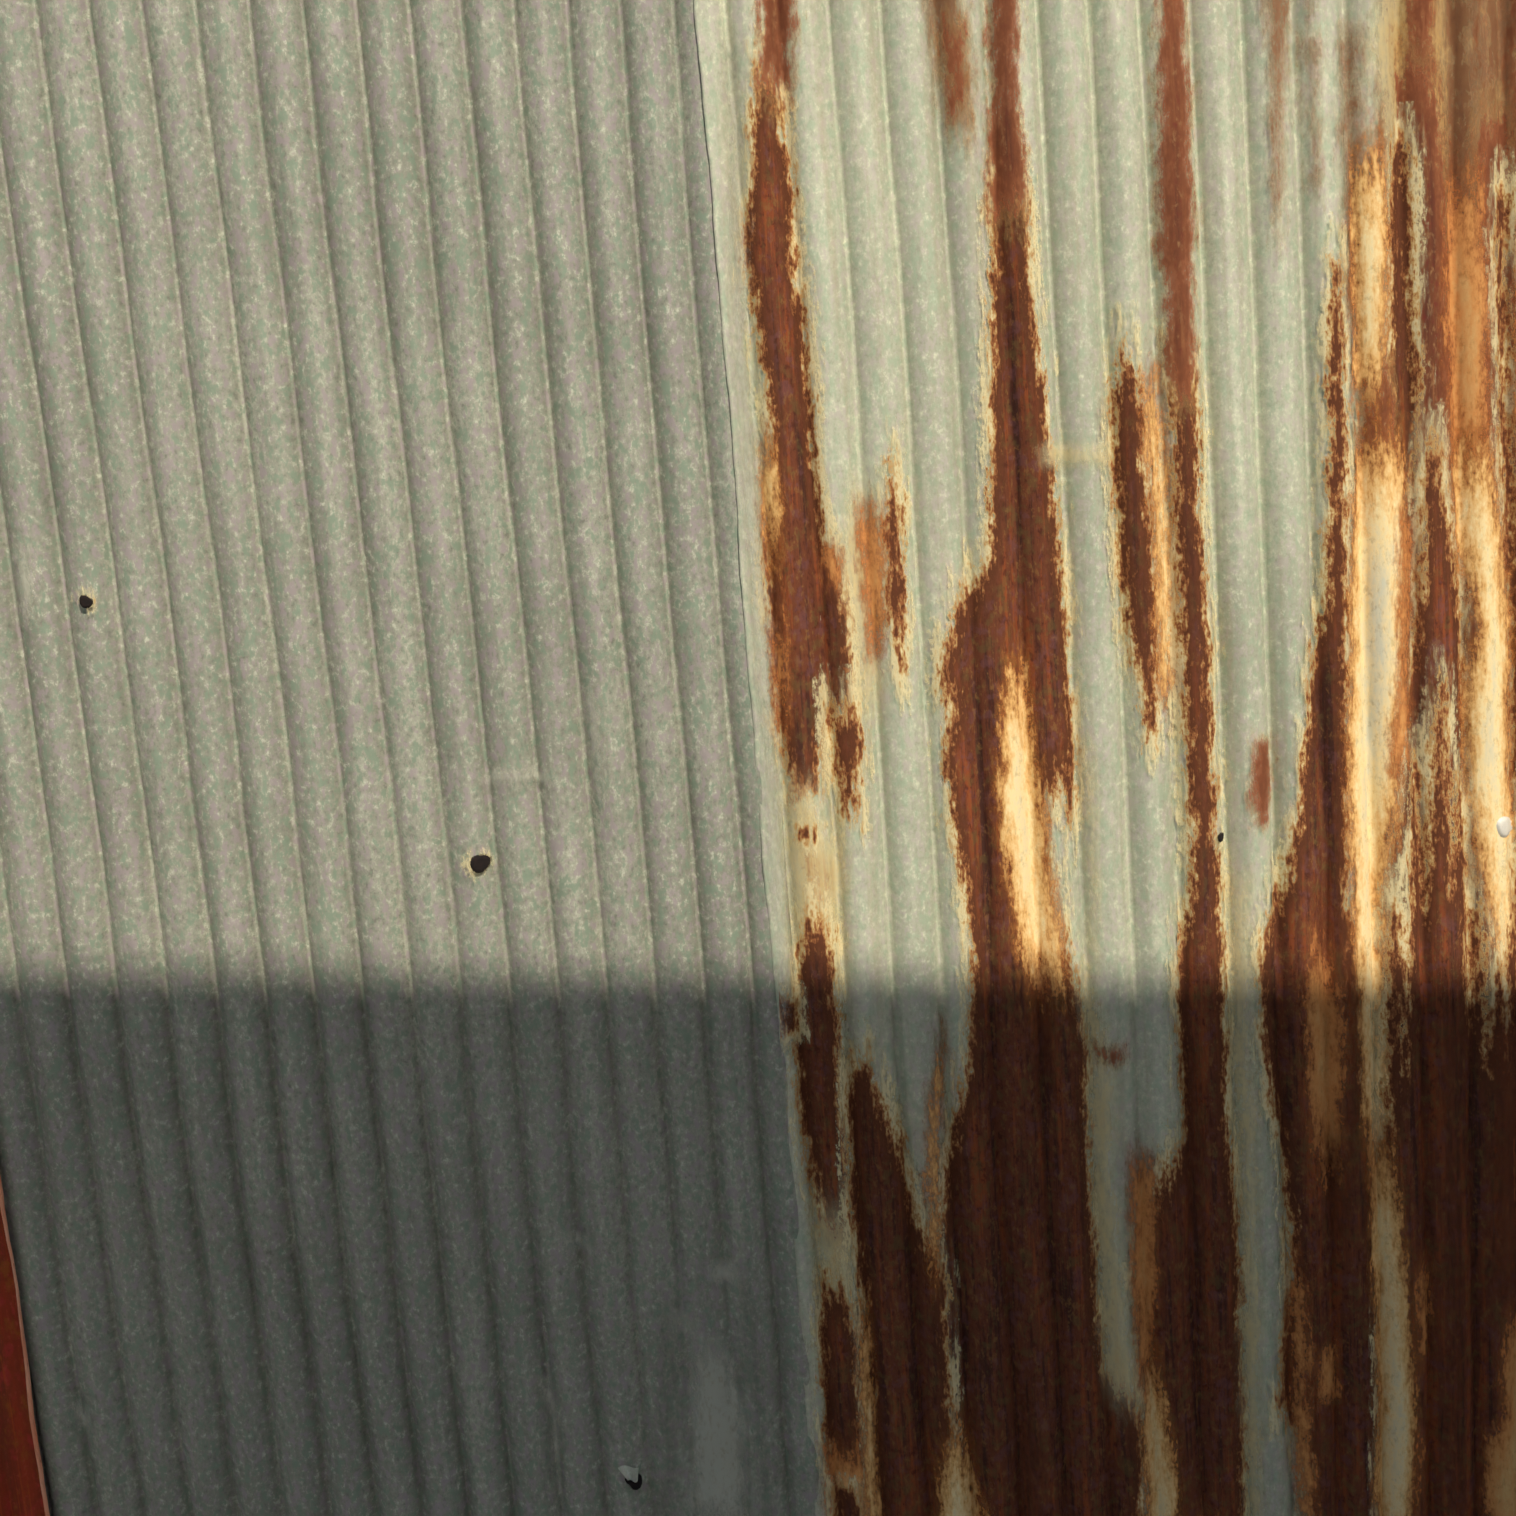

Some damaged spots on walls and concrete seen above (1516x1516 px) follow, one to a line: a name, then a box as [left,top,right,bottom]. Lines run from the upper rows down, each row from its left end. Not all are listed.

rust [732,0,1516,1516]